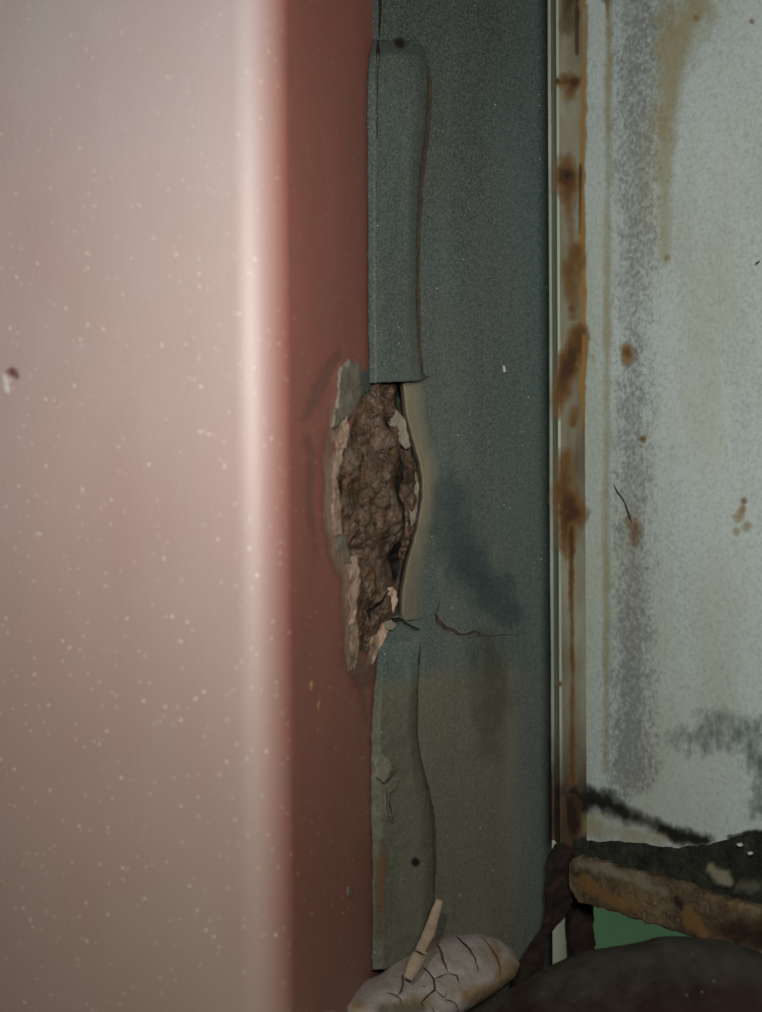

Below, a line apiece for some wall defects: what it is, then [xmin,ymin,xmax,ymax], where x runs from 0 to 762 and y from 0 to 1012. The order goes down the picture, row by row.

rust [553,0,588,427]
rust [622,344,633,364]
spalling [323,382,444,676]
crack [383,601,513,638]
rust [554,452,586,838]